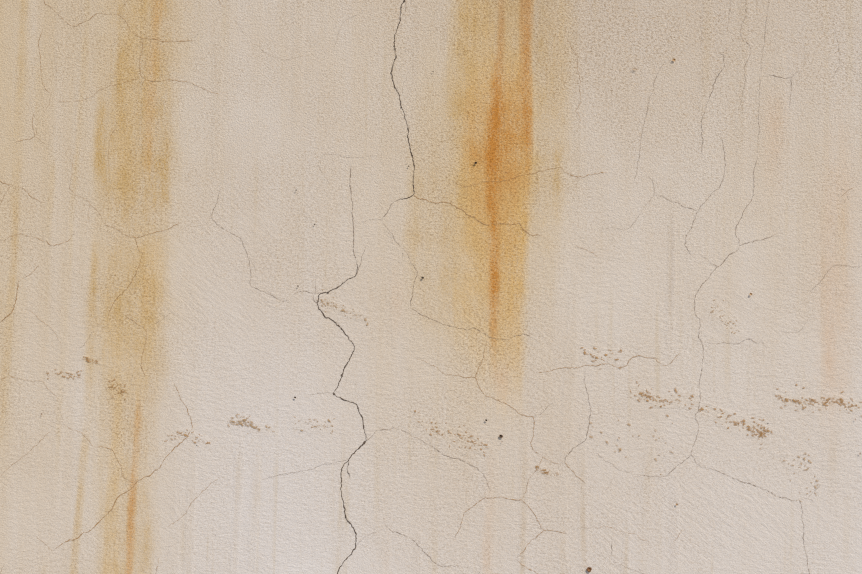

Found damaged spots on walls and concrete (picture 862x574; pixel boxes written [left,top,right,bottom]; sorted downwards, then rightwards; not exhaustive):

crack [61,387,193,545]
corrosion [54,0,223,574]
crack [300,170,386,574]
crack [391,0,535,236]
corrosion [421,0,552,469]